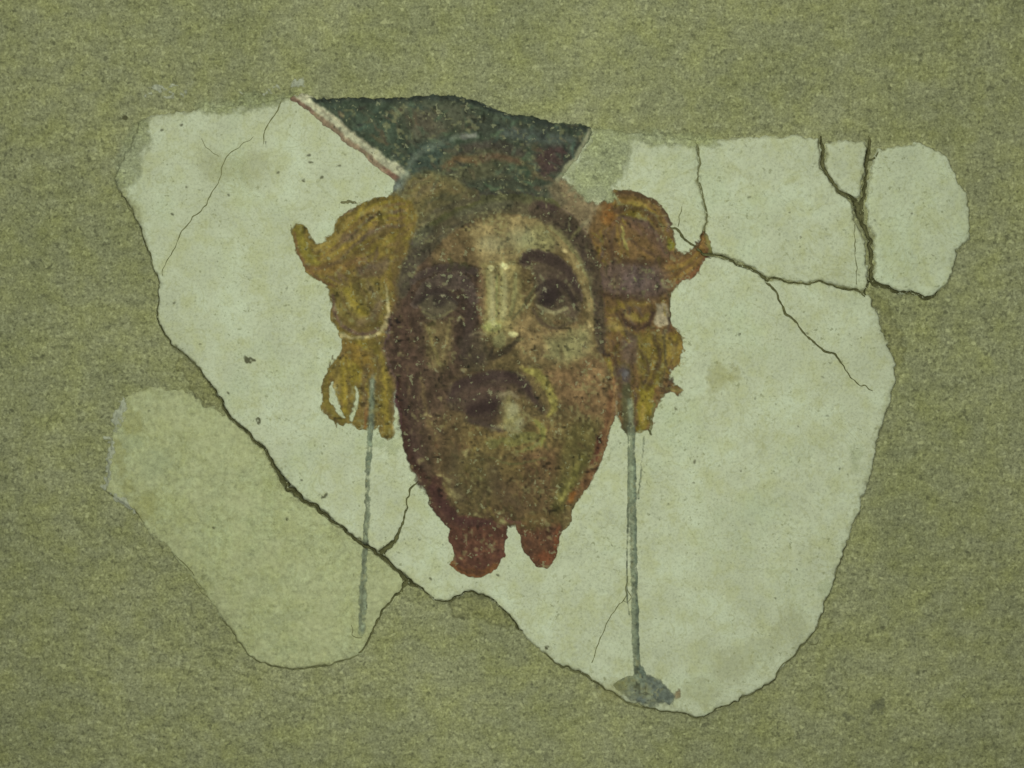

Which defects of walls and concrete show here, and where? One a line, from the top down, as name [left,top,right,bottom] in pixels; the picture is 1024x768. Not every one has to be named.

crack [122,101,523,670]
crack [656,136,937,391]